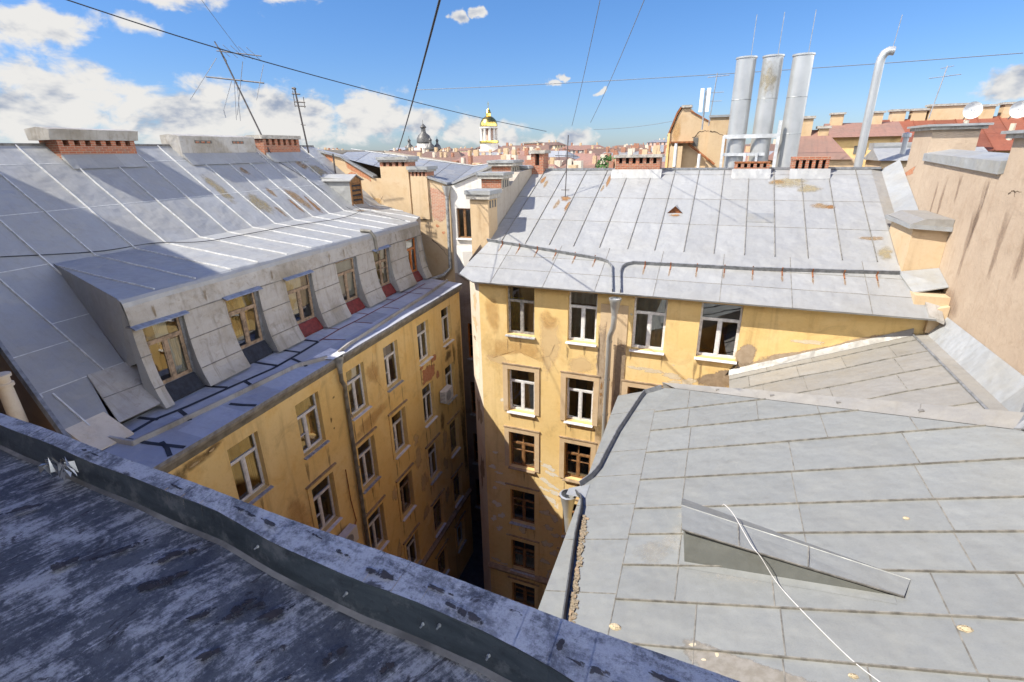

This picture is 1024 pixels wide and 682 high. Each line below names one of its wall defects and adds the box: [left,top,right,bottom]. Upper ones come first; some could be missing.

corrosion [772,179,817,192]
corrosion [250,189,323,216]